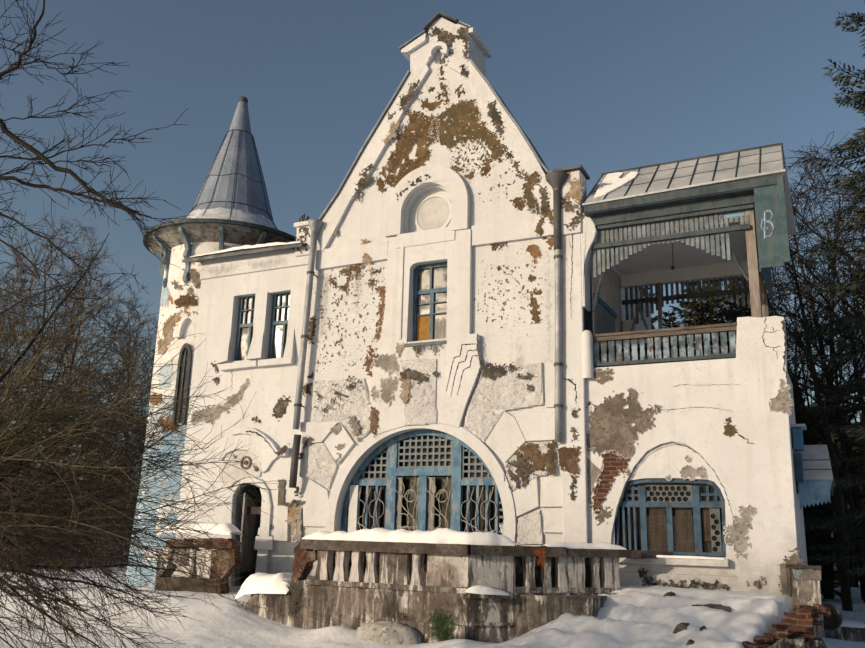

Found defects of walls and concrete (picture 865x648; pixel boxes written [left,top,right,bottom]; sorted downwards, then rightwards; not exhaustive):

flaking render [353,26,585,334]
flaking render [149,269,201,406]
flaking render [140,378,251,482]
flaking render [270,395,291,422]
flaking render [303,239,438,462]
flaking render [481,360,533,391]
flaking render [504,367,663,526]
flaking render [665,454,708,481]
crack [762,318,788,378]
flaking render [768,378,794,416]
flaking render [723,504,757,560]